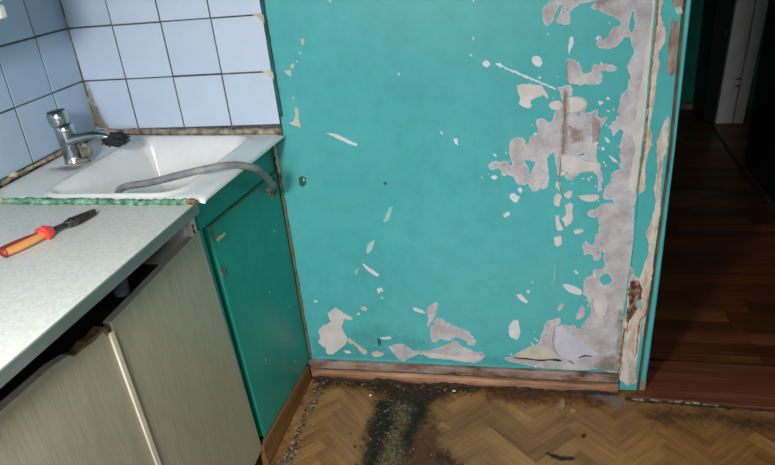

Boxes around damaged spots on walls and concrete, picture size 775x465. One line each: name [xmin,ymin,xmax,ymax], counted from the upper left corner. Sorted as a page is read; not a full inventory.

peeling [481,0,684,373]
peeling [318,302,484,363]
corrosion [597,299,648,374]
leakage [399,401,430,457]